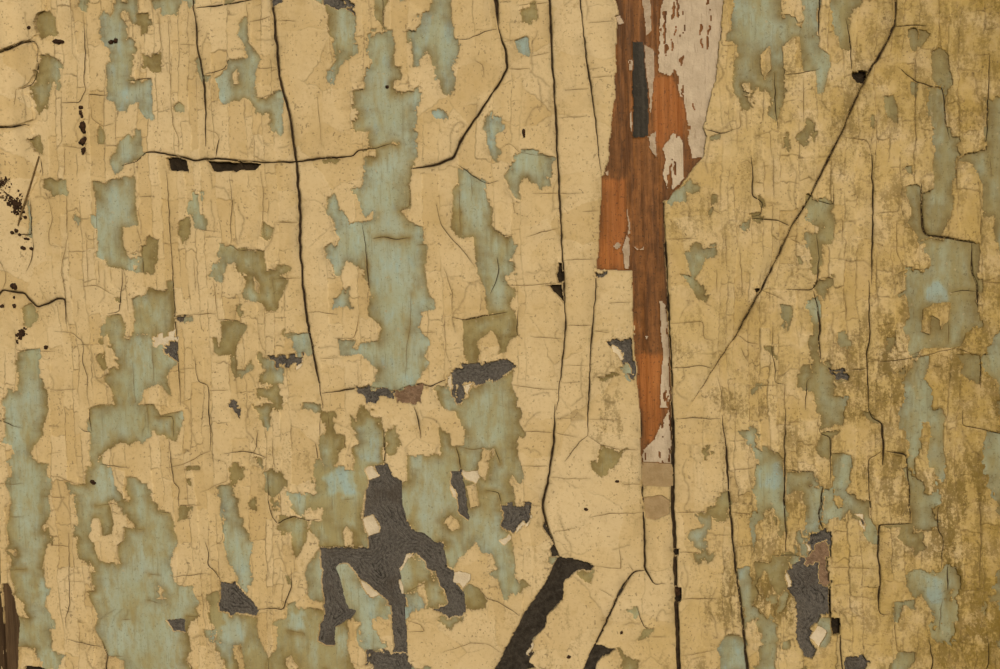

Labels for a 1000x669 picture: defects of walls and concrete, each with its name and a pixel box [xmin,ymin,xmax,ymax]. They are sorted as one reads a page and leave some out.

crack [0,41,39,128]
peeling [30,54,64,115]
peeling [36,11,59,39]
peeling [2,348,66,669]
crack [0,199,122,433]
peeling [65,0,594,669]
crack [122,0,642,557]
peeling [591,445,628,478]
peeling [687,491,732,565]
peeling [597,0,863,520]
crack [592,0,993,669]
peeling [717,28,1000,669]